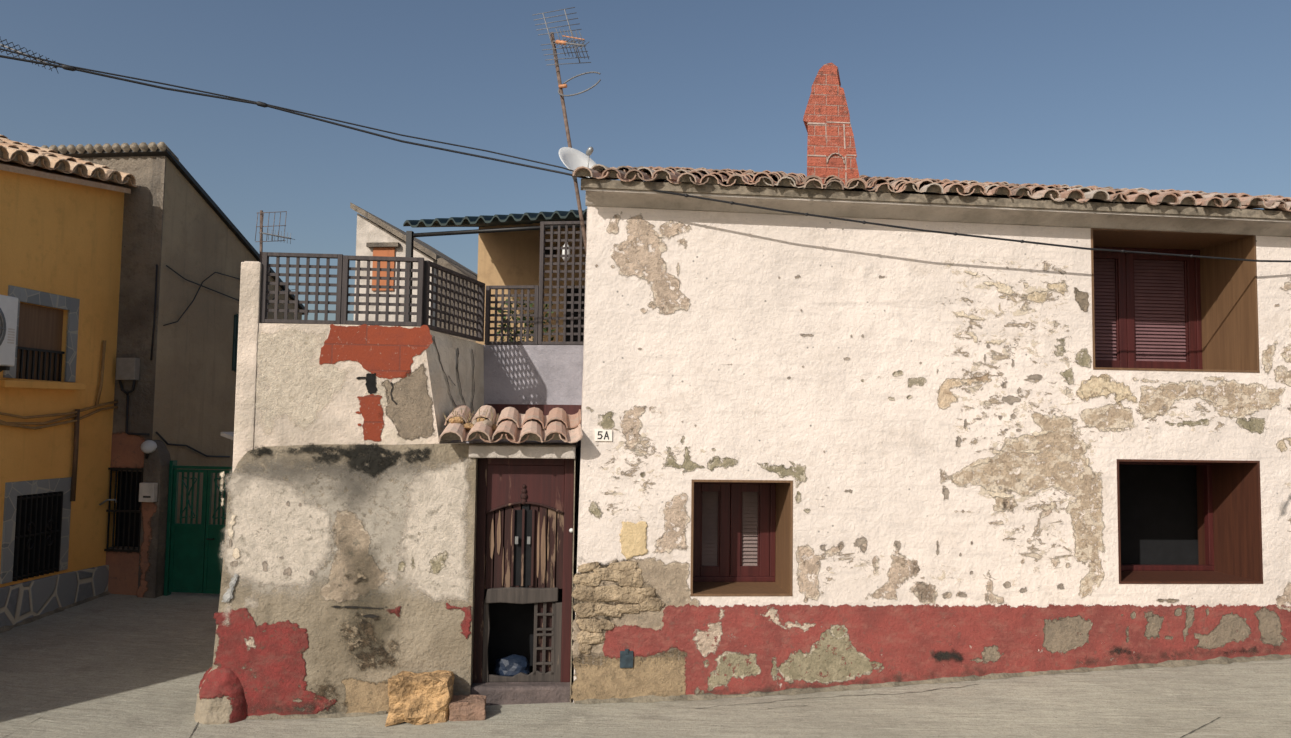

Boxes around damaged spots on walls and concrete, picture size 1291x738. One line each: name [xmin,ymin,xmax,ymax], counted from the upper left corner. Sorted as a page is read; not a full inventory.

peeling [595,212,691,315]
peeling [861,258,1291,598]
peeling [758,461,853,513]
peeling [213,459,472,716]
spalling [571,405,739,666]
peeling [633,607,884,695]
peeling [796,536,1027,605]
peeling [1042,615,1093,654]
peeling [1121,582,1291,649]